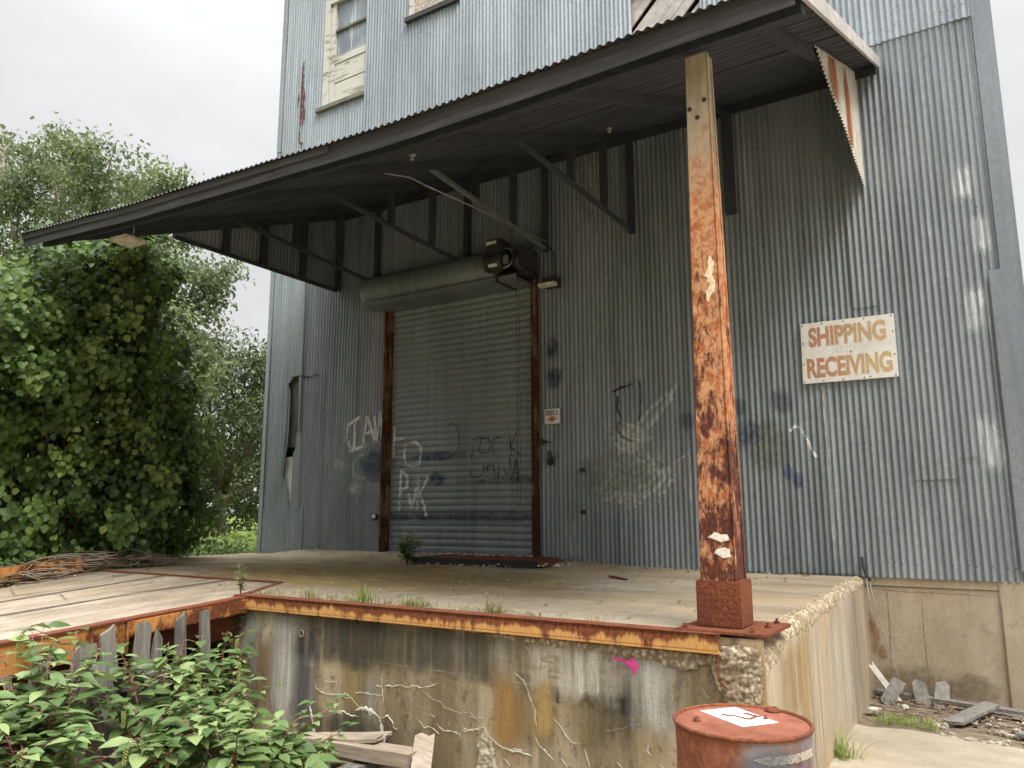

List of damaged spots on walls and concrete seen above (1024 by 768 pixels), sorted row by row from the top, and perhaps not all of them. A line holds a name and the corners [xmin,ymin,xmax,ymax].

water stain [271,612,384,732]
crack [315,637,590,768]
water stain [476,727,498,768]
water stain [532,639,669,732]
spalling [466,576,864,706]